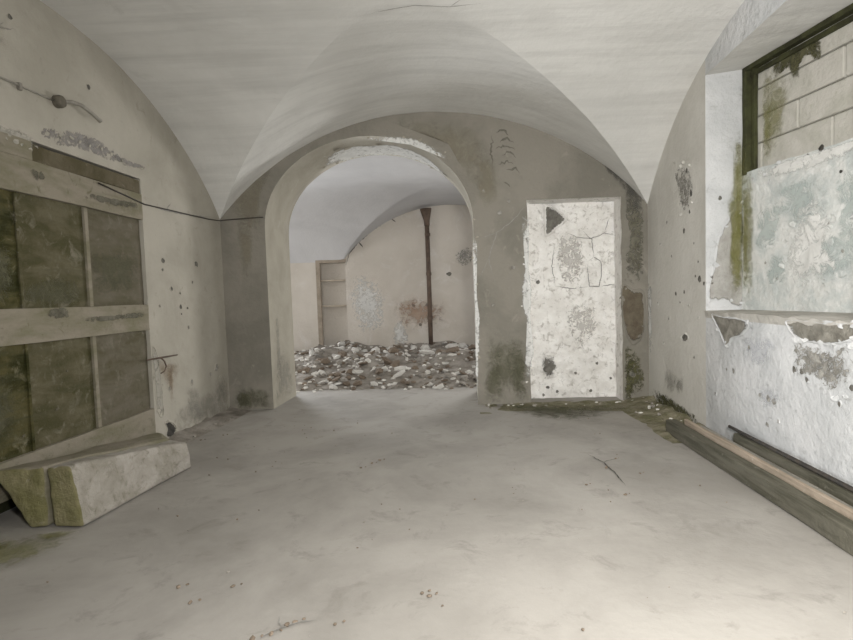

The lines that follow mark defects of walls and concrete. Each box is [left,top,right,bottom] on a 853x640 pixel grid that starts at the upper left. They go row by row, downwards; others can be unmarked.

peeling [41,129,145,170]
spalling [673,158,693,216]
damp [732,152,747,278]
spalling [785,320,853,408]